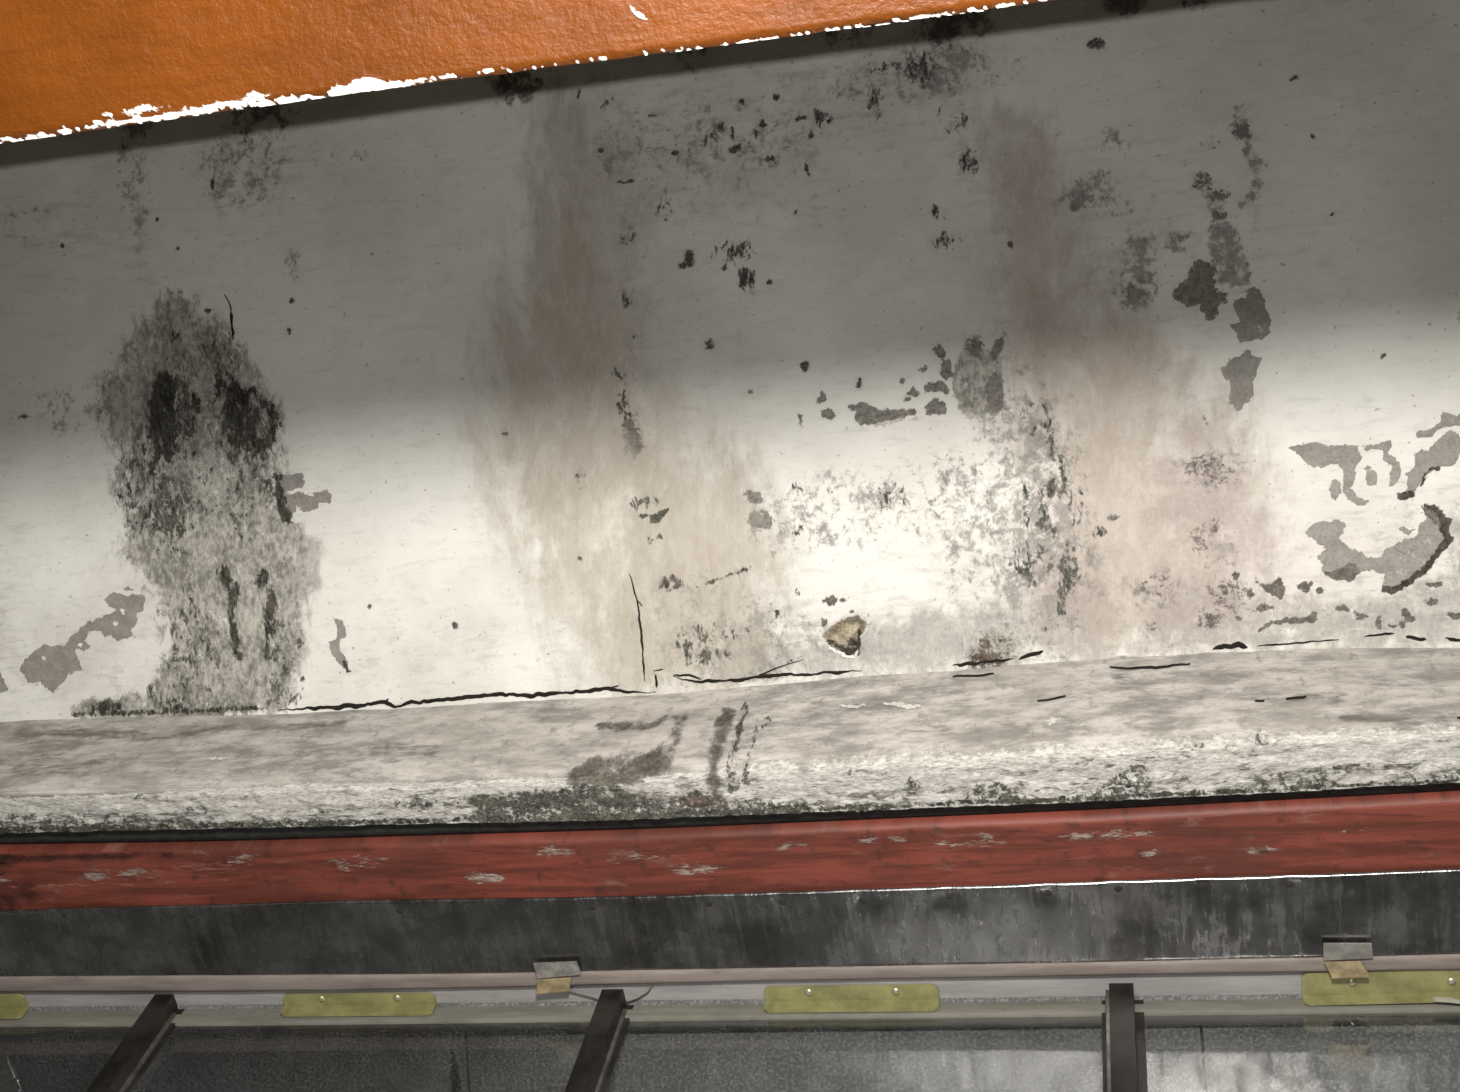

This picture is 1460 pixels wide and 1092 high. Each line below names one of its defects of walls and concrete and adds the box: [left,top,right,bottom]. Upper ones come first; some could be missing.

peeling [0,74,456,144]
peeling [724,0,1047,45]
damp [837,11,998,134]
damp [1110,105,1263,321]
peeling [798,333,1008,427]
peeling [1221,287,1271,411]
damp [29,289,344,739]
damp [525,265,1460,681]
peeling [1204,412,1460,632]
peeling [20,586,145,693]
crack [280,574,862,711]
damp [0,702,1460,834]